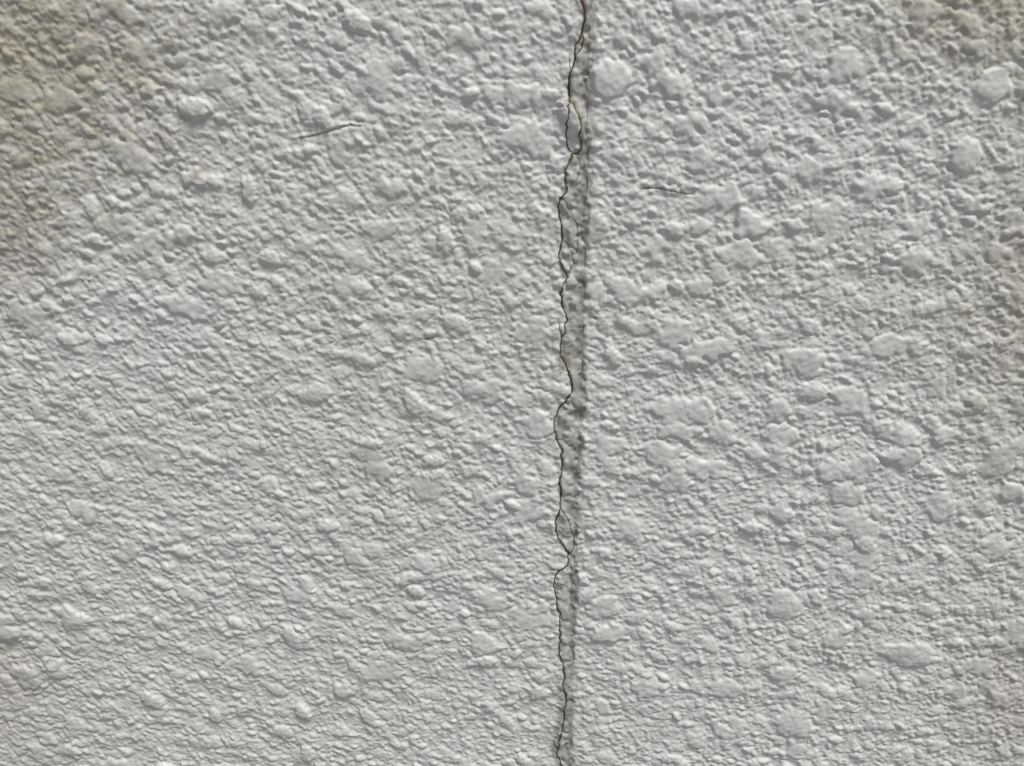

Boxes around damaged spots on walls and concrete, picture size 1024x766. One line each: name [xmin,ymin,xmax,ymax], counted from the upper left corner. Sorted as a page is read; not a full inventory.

crack [551,0,591,766]